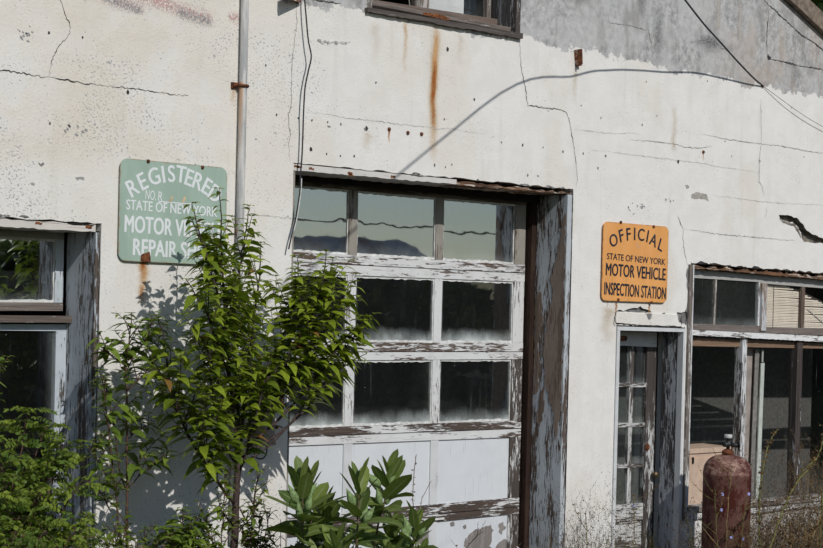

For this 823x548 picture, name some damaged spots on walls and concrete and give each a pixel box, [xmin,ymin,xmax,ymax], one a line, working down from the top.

crack [0,0,188,96]
rust [430,32,439,132]
crack [519,44,822,217]
rust [140,262,148,296]
peeling [533,213,567,440]
crack [678,217,794,267]
spalling [779,215,823,243]
peeling [450,521,507,548]